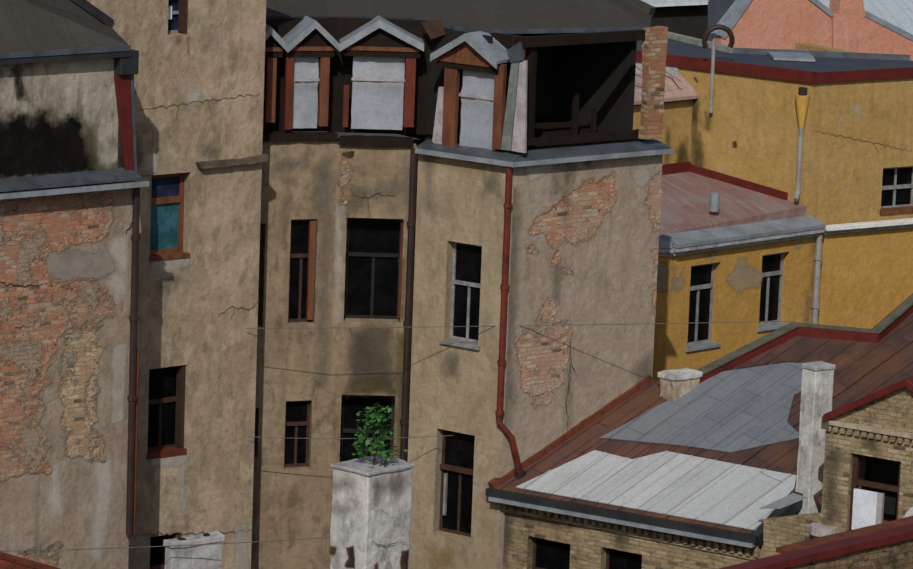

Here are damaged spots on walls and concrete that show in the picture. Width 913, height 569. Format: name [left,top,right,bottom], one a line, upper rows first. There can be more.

crack [140,93,260,117]
spalling [526,170,617,275]
peeling [727,258,763,292]
spalling [0,190,127,483]
spalling [515,298,573,408]